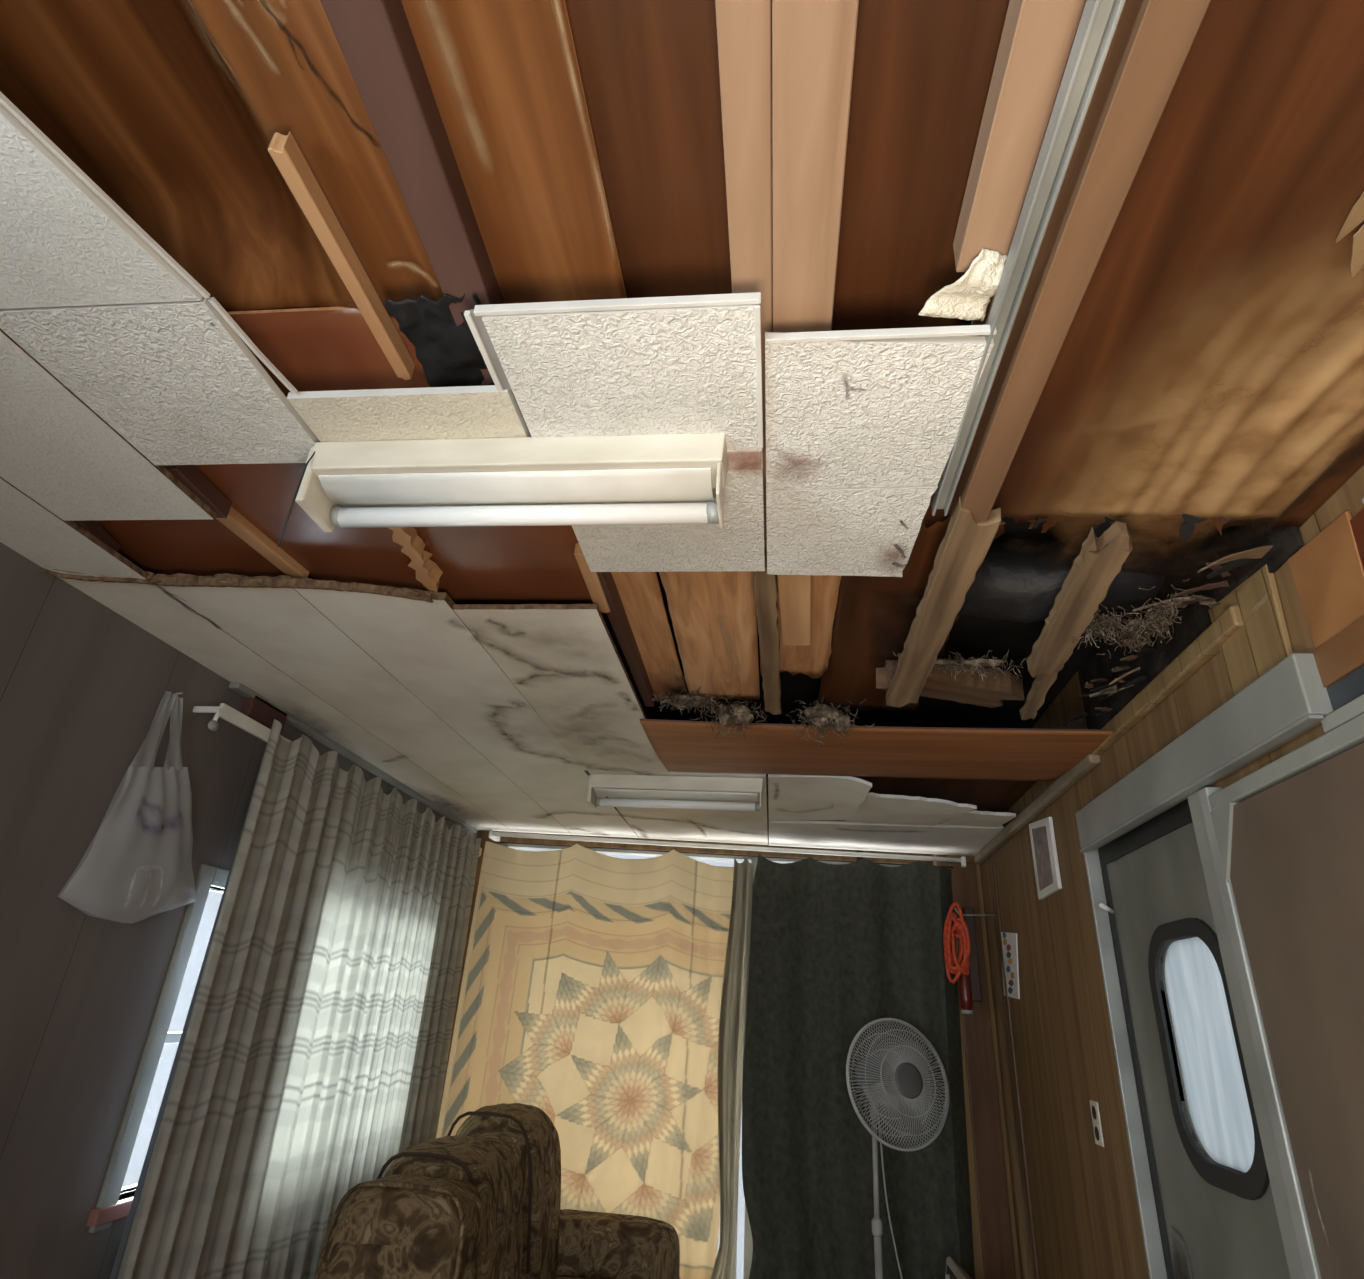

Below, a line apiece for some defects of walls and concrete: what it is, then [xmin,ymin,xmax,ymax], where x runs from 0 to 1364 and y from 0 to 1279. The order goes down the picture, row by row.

crack [263,4,377,146]
water stain [1120,533,1251,593]